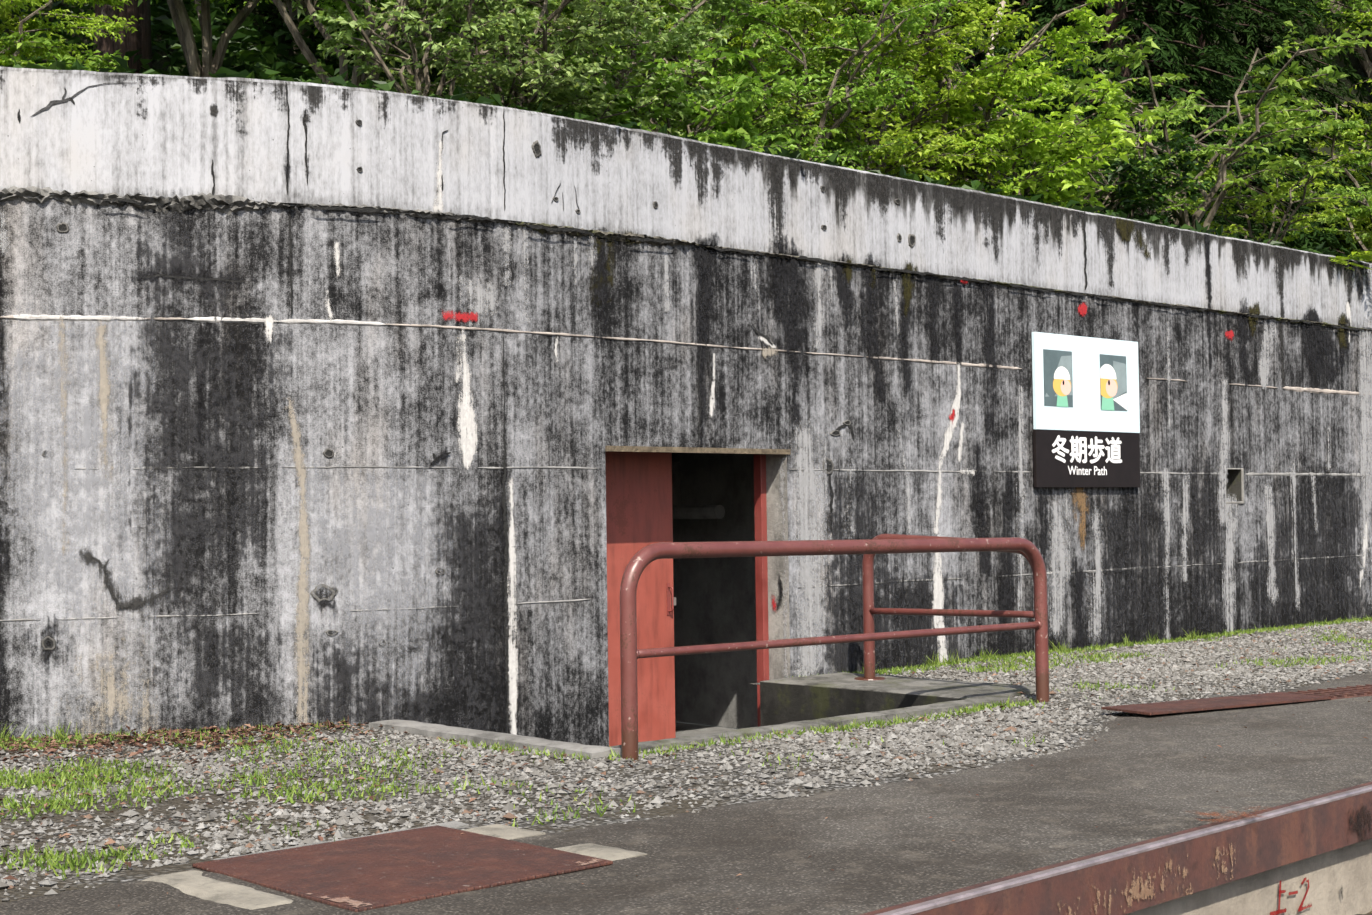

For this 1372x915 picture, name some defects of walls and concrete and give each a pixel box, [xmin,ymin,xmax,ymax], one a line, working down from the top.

crack [17,82,127,123]
damp [479,105,497,123]
damp [0,116,1372,735]
crack [79,548,174,612]